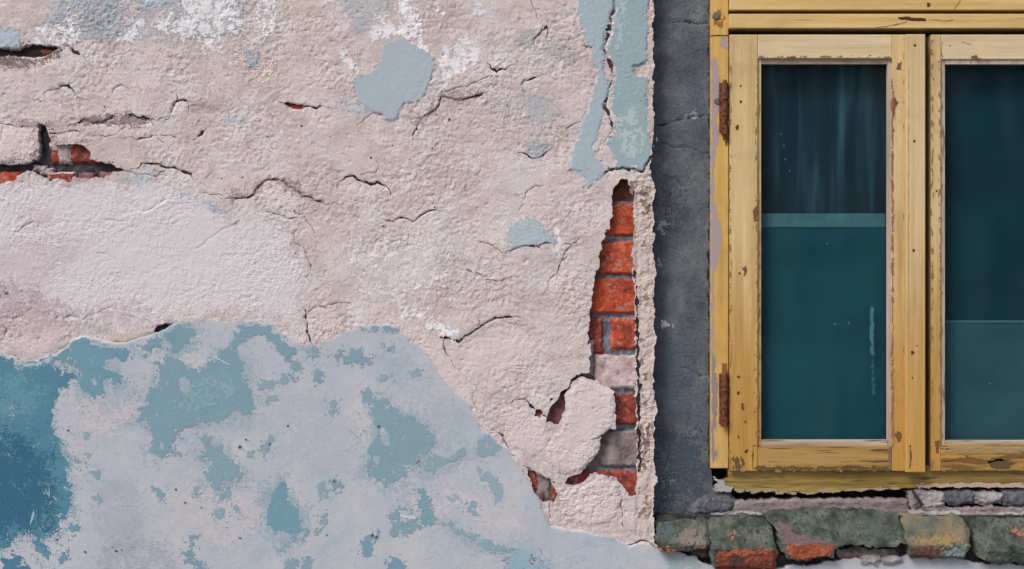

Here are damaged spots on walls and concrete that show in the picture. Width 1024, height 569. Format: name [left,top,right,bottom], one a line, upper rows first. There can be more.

spalling [0,23,58,58]
peeling [352,37,438,121]
crack [411,1,548,147]
flaking render [0,124,124,184]
crack [0,82,442,276]
crack [302,302,351,344]
crack [440,211,587,364]
peeling [506,215,556,254]
flaking render [527,0,657,538]
peeling [0,313,548,569]
peeling [713,476,900,495]
spalling [673,521,971,569]